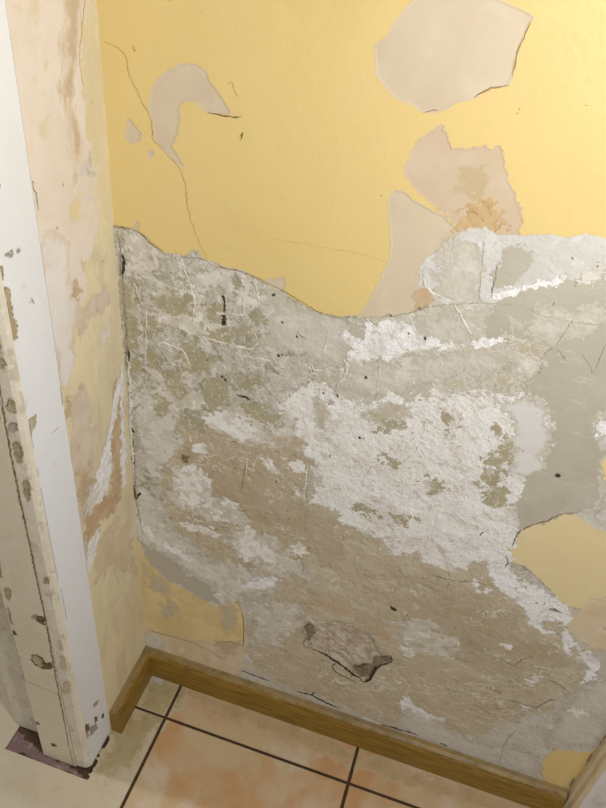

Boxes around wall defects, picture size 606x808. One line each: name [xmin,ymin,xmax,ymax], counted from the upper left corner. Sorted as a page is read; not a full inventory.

spalling [0,266,18,341]
spalling [6,399,24,464]
peeling [6,731,89,780]
peeling [5,0,121,351]
crack [113,226,164,548]
peeling [125,63,242,167]
peeling [70,383,460,752]
damp [75,281,606,740]
crack [107,43,606,372]
peeling [199,123,546,407]
peeling [374,0,534,114]
spalling [464,560,606,782]